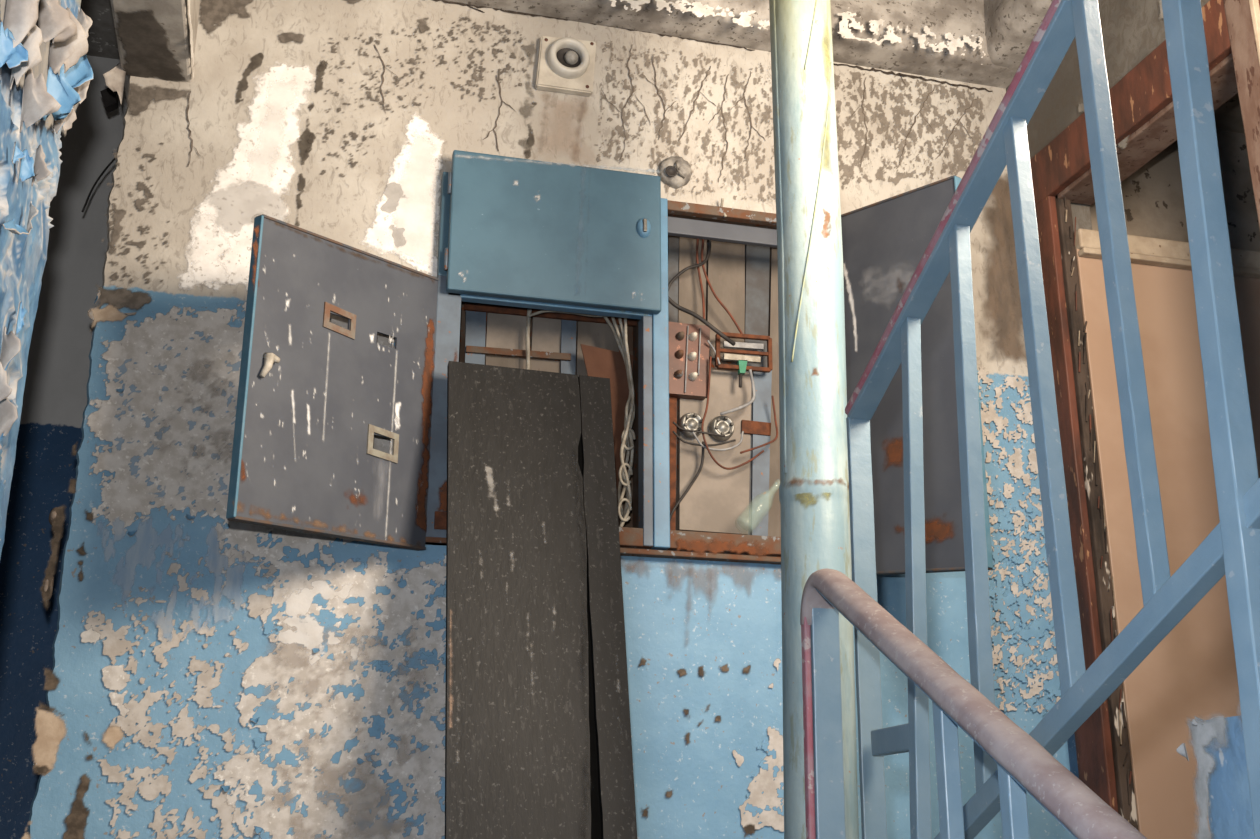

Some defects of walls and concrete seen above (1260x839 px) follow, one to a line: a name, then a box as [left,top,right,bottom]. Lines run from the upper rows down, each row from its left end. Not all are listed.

peeling [610,0,770,29]
peeling [0,0,93,186]
peeling [2,201,39,235]
peeling [0,301,27,450]
peeling [40,143,446,839]
peeling [977,366,1061,716]
spalling [33,669,67,775]
peeling [684,705,721,744]
peeling [732,750,744,767]
peeling [739,727,784,836]
spalling [1176,709,1242,839]